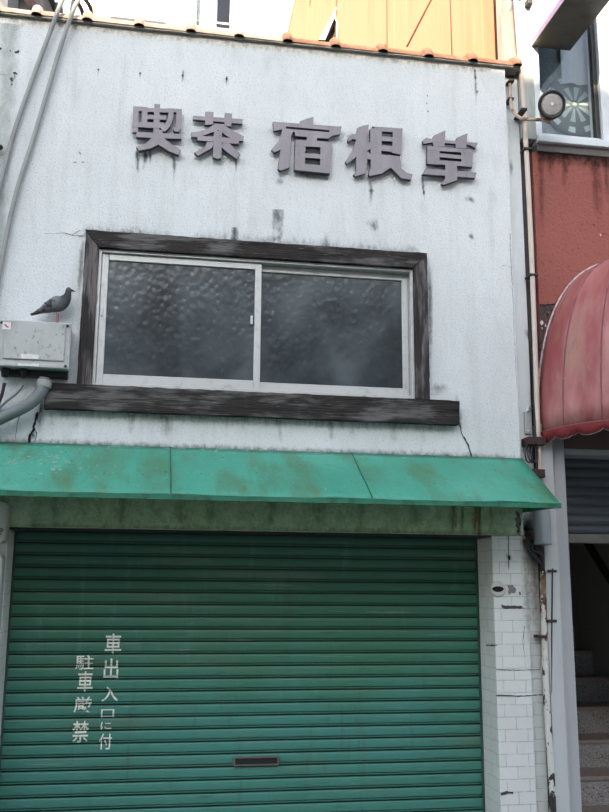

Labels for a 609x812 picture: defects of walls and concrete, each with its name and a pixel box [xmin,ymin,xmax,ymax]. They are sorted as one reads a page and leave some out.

leakage [538,152,609,166]
crack [15,402,43,443]
crack [459,423,472,457]